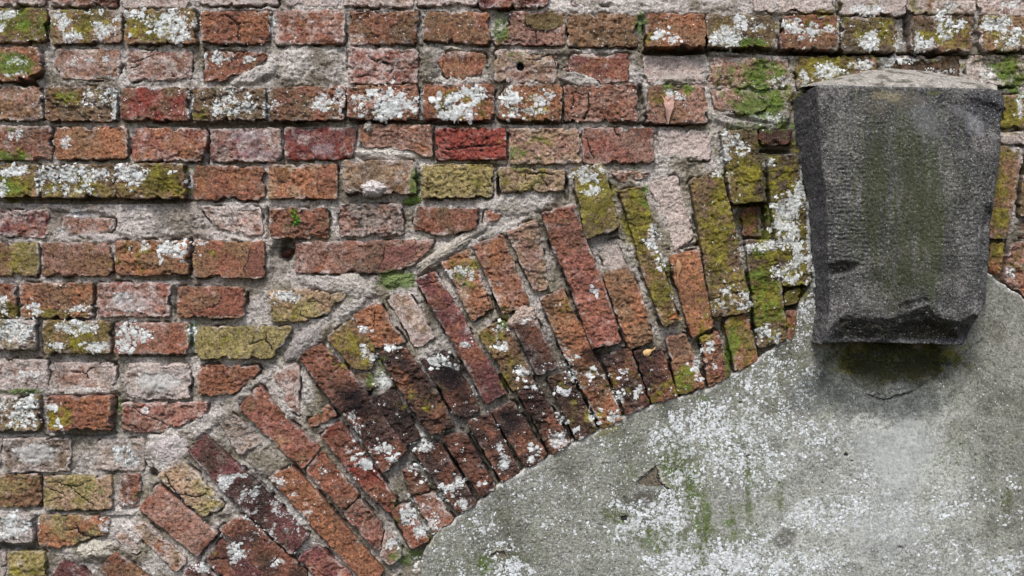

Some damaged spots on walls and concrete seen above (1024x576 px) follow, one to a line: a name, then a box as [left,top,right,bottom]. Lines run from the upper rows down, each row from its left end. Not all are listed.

water stain [797,343,951,413]
flaking render [636,465,670,489]